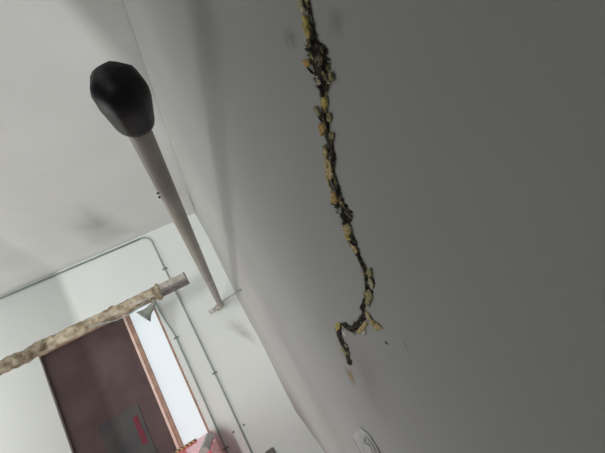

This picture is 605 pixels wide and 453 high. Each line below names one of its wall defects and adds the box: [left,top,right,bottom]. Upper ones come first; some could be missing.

crack [296,0,383,366]